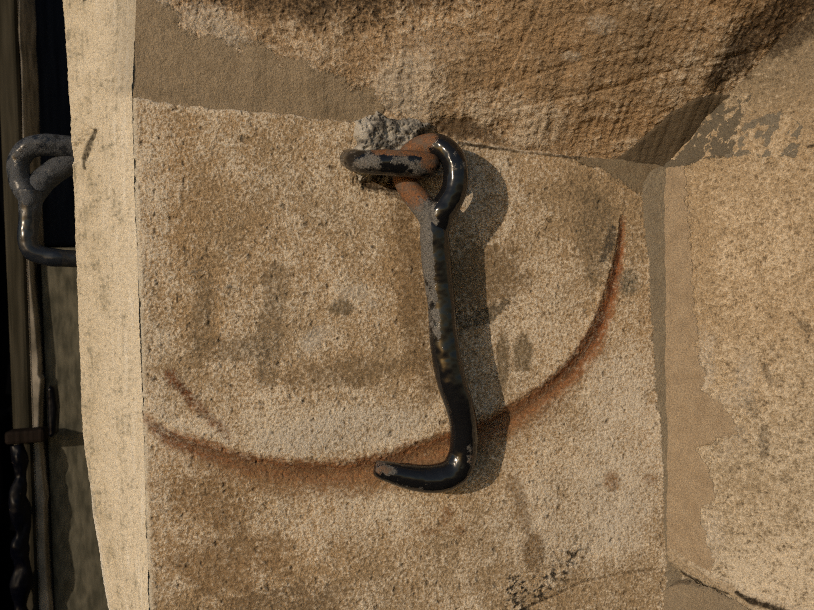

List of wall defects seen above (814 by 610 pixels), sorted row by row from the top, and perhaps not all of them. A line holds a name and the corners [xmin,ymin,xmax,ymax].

corrosion [478,221,625,451]
corrosion [165,371,193,406]
corrosion [151,424,450,495]
crack [682,573,784,610]